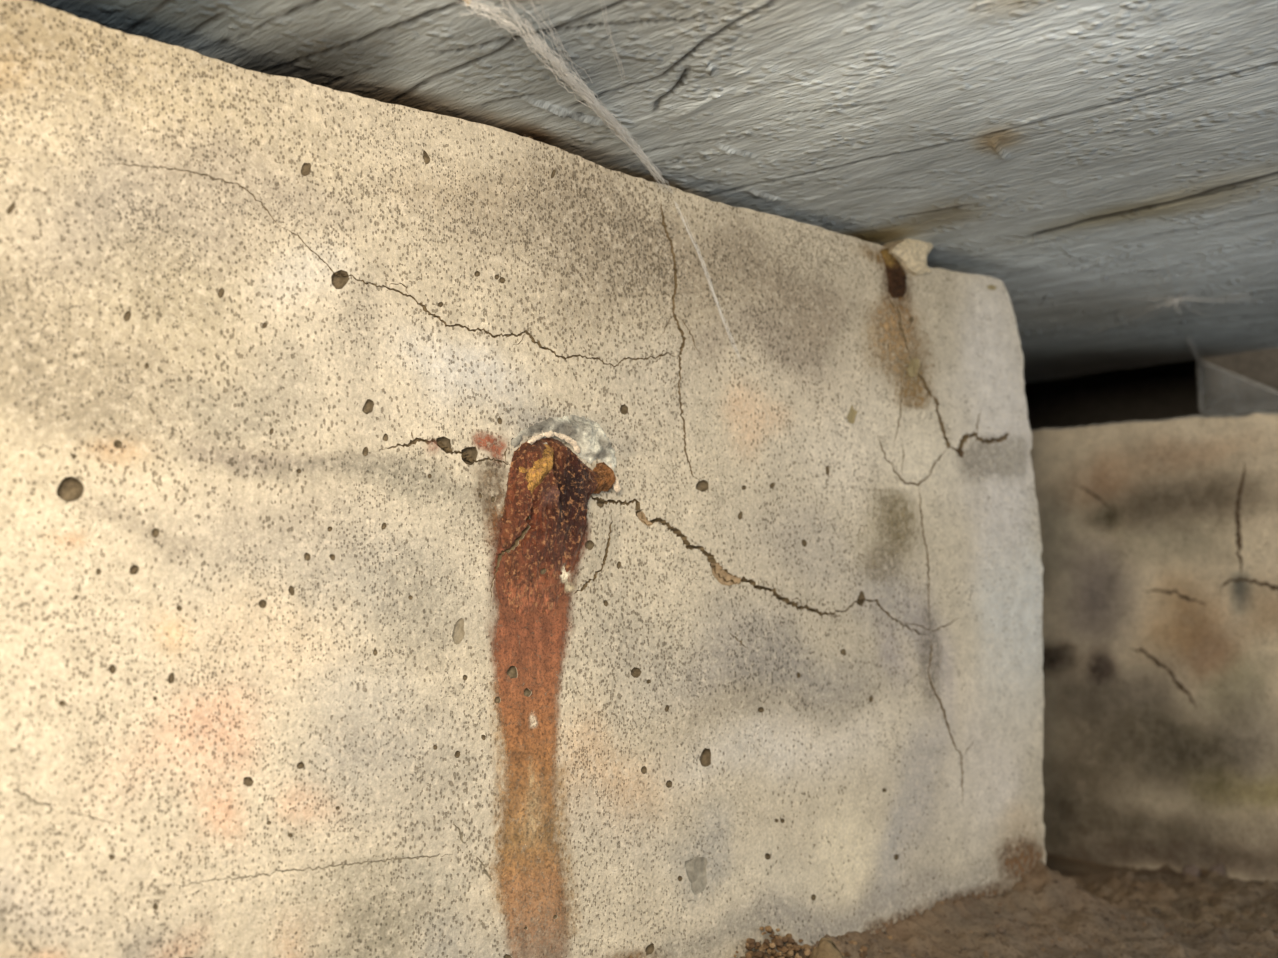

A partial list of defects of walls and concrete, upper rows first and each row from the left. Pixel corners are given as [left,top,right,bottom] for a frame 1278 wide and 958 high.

crack [111,163,701,481]
rust [474,434,616,958]
crack [574,293,1009,806]
crack [1131,648,1197,709]
crack [1140,462,1278,605]